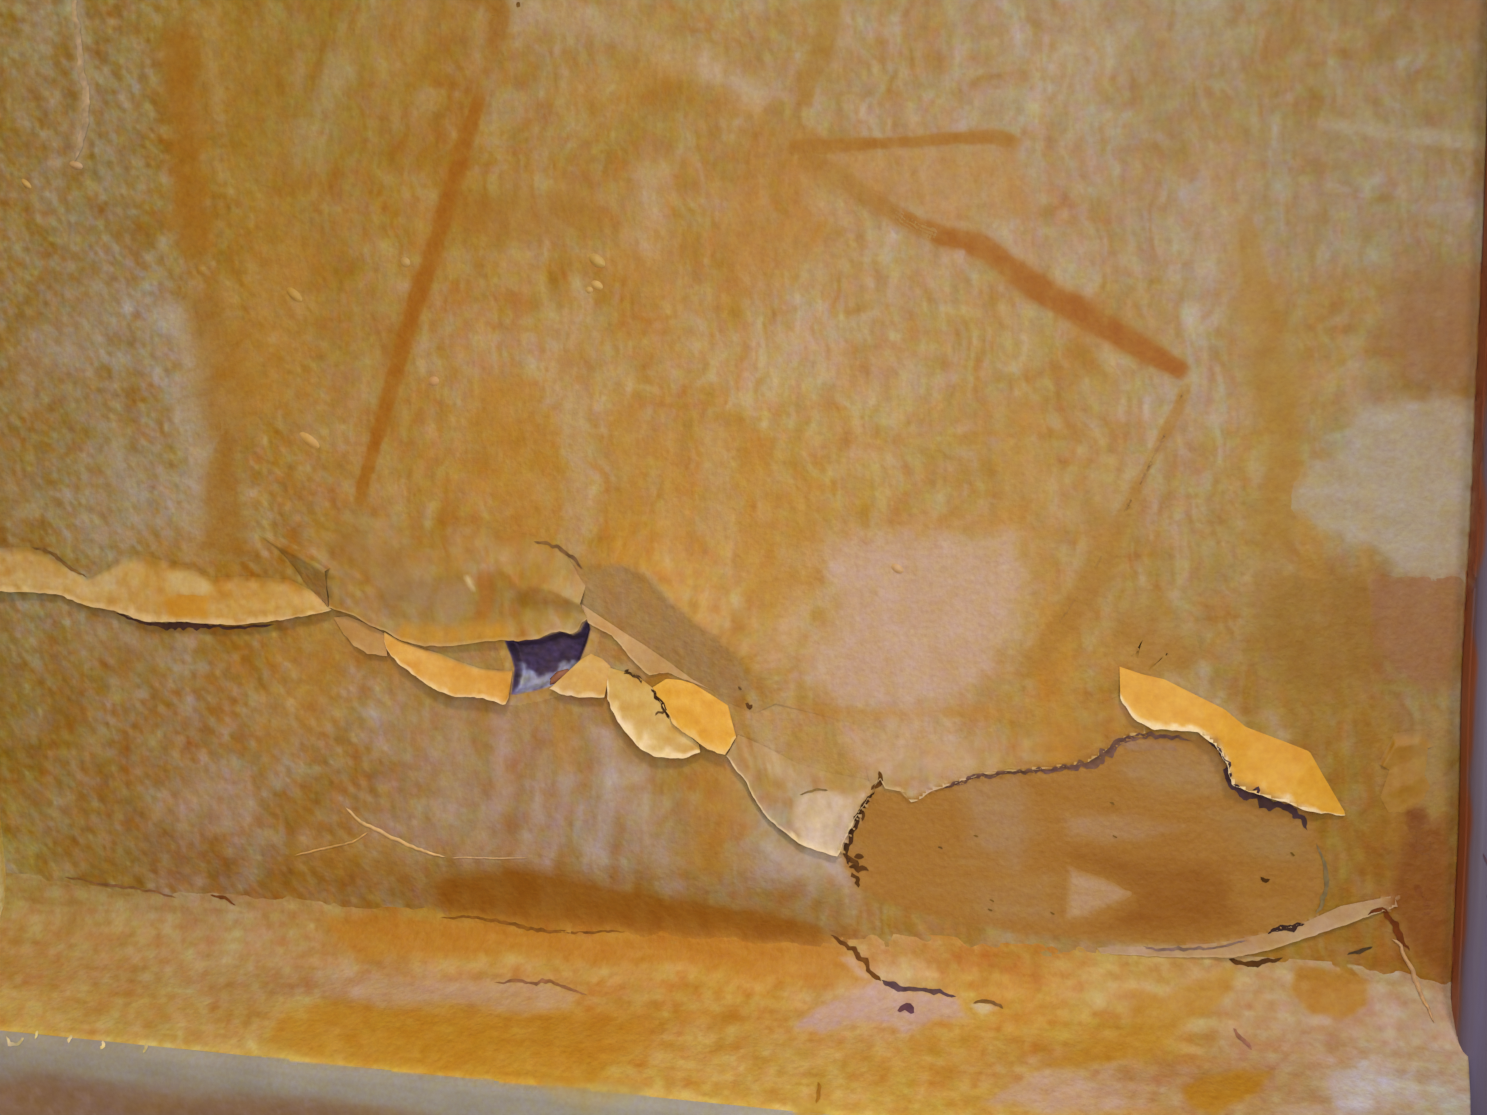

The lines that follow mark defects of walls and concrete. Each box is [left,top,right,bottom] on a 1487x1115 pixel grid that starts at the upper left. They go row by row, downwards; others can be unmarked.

peeling [0,515,587,705]
spalling [550,654,1398,958]
leakage [254,994,663,1115]
leakage [319,853,876,996]
crack [832,935,1003,1014]
leakage [1022,961,1241,1074]
leakage [1177,1064,1276,1115]
leakage [1285,961,1374,1023]
leakage [1316,1055,1424,1115]
leakage [1435,1096,1470,1115]